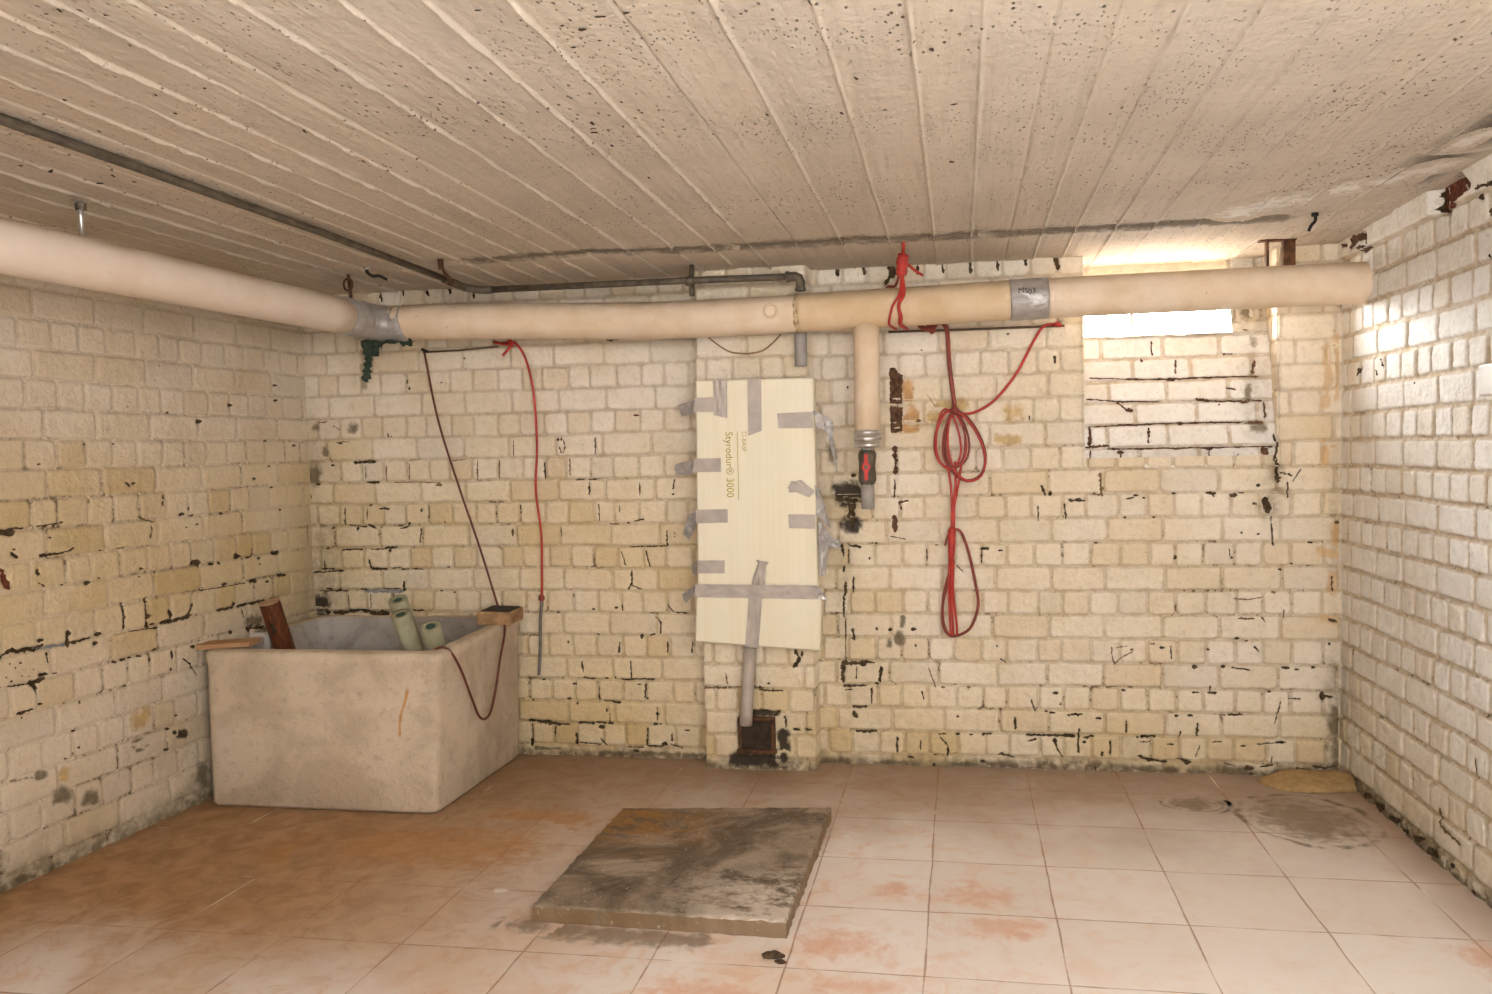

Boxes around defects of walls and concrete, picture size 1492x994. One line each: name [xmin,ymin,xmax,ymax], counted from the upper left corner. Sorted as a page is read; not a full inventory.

leakage [724,707,855,770]
leakage [8,761,107,812]
leakage [187,753,213,797]
leakage [1320,698,1492,908]